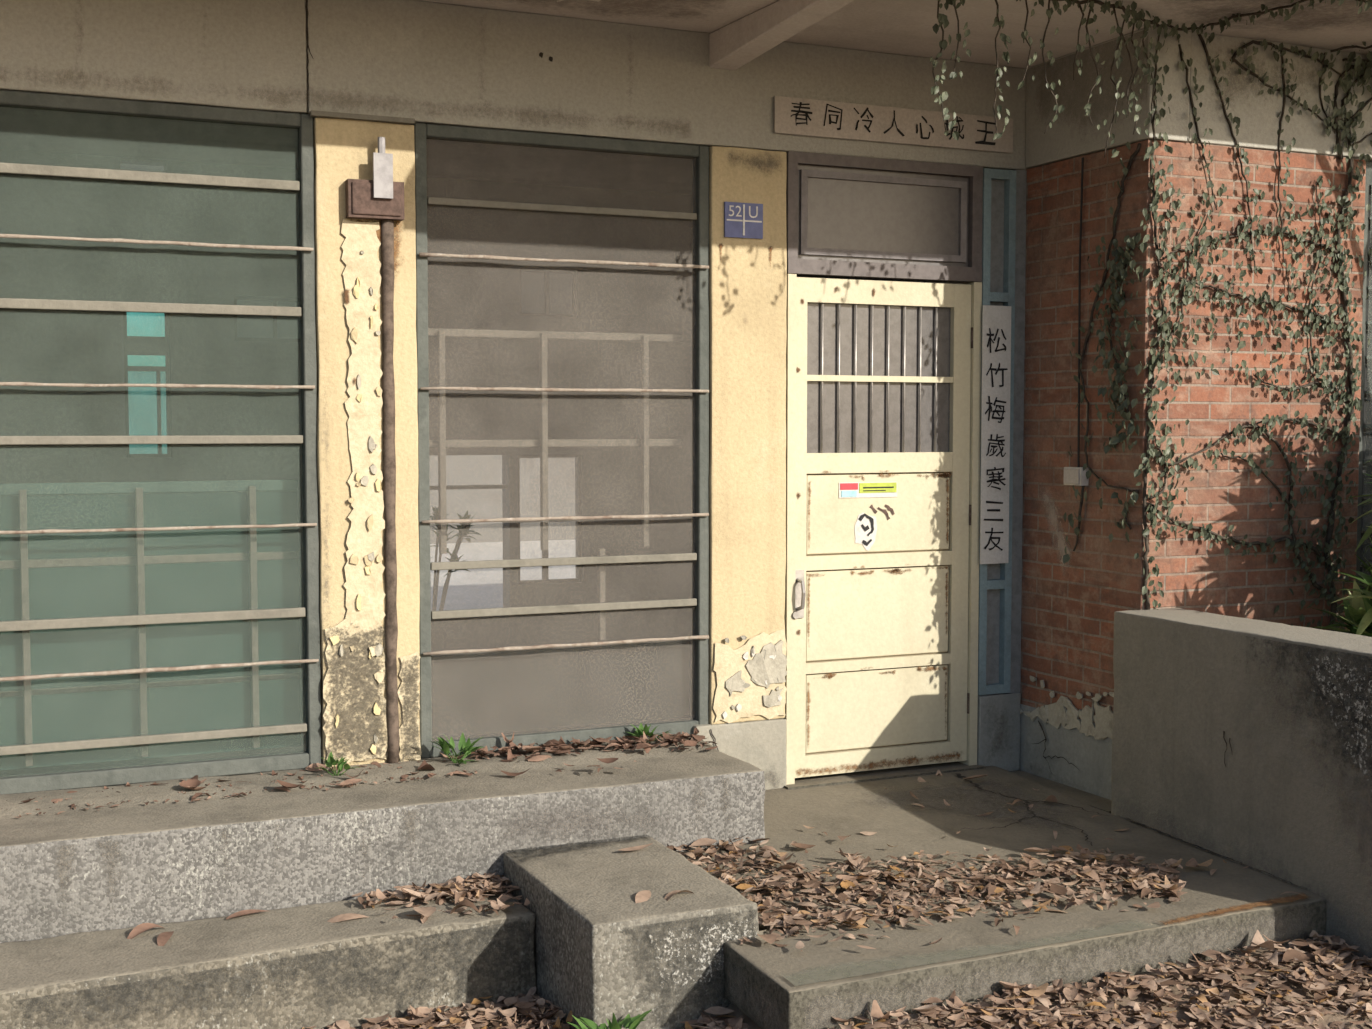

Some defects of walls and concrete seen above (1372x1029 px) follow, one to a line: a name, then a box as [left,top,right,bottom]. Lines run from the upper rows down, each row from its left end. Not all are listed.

crack [305,0,313,111]
peeling [323,219,422,764]
rust [919,472,952,542]
peeling [713,629,787,723]
rust [797,752,960,776]
peeling [1020,676,1114,740]
damp [1253,637,1372,832]